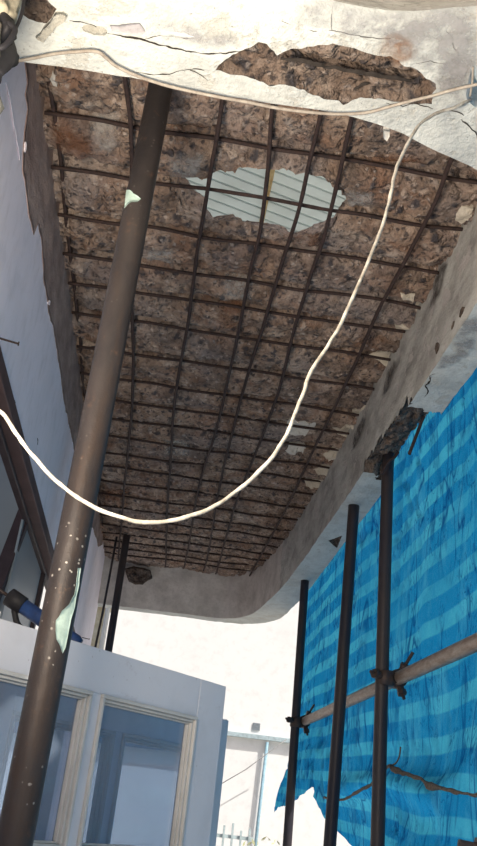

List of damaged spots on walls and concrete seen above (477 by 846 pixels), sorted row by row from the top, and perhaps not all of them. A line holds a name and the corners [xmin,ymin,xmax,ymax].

spalling [23,0,67,43]
peeling [110,23,145,36]
crack [69,20,241,81]
spalling [216,42,436,105]
crack [387,103,477,136]
peeling [22,62,140,449]
spalling [92,95,477,585]